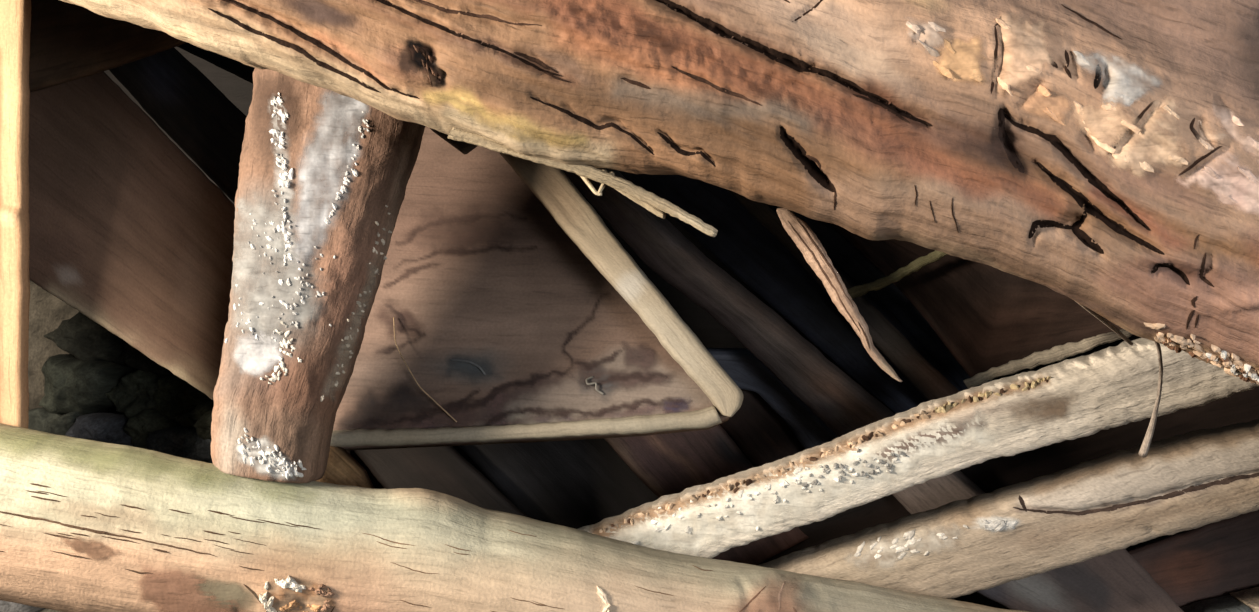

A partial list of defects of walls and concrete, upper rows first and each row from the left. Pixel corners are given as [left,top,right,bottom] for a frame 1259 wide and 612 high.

damp [259,85,293,126]
damp [225,94,370,385]
crack [208,0,419,99]
crack [376,0,715,166]
crack [672,66,836,209]
peeling [906,15,1259,213]
crack [991,16,1214,329]
crack [1013,473,1259,516]
damp [199,582,251,607]
peeling [259,575,335,612]